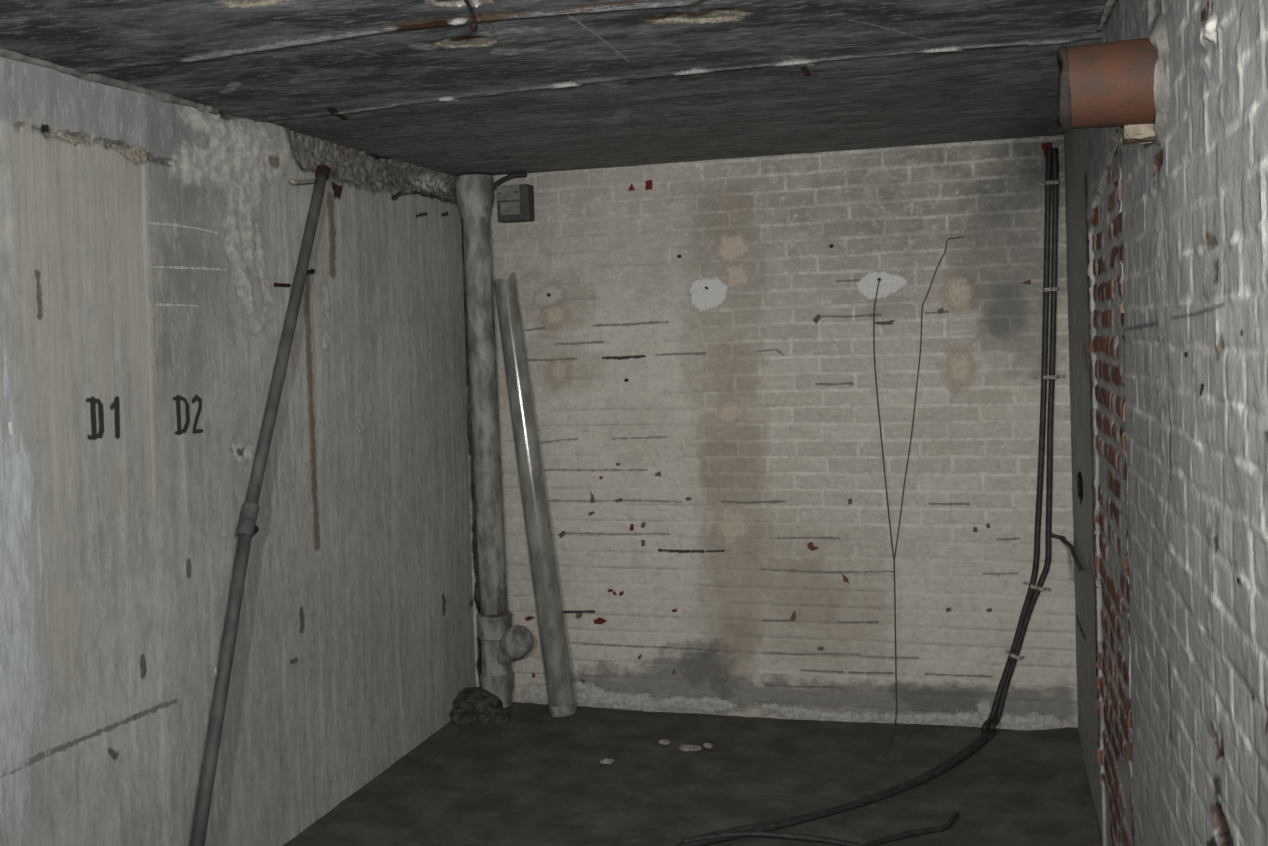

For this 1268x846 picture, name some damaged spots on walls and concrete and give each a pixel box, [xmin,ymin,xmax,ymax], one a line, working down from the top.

spalling [219,0,296,8]
rust [381,12,532,32]
spalling [643,9,754,24]
spalling [431,36,500,49]
peeling [168,105,457,335]
leakage [719,235,749,287]
flaking render [1084,127,1134,846]
efflorescence [523,684,549,703]
efflorescence [573,681,737,713]
leakage [753,698,1065,730]
spalling [1210,715,1224,760]
spalling [1207,776,1233,846]